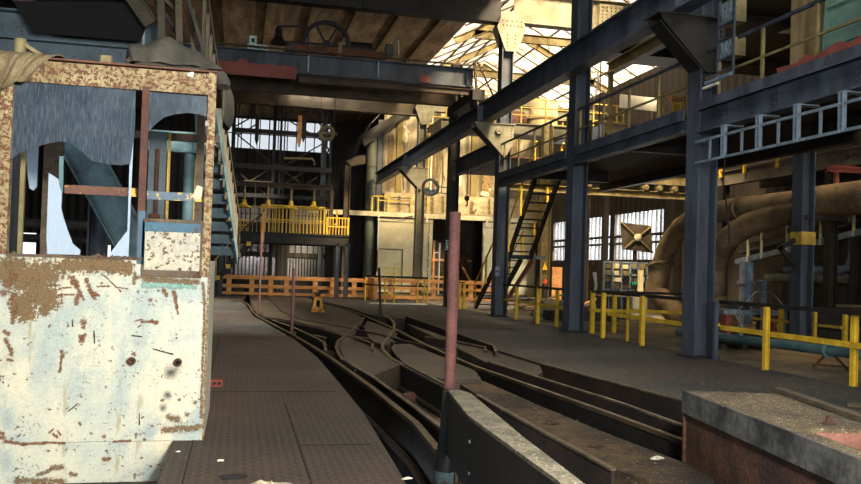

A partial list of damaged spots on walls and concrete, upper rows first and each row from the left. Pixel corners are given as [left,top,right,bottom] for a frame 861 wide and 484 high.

corrosion [0,274,17,362]
corrosion [58,272,207,433]
corrosion [0,429,66,446]
corrosion [14,464,78,484]